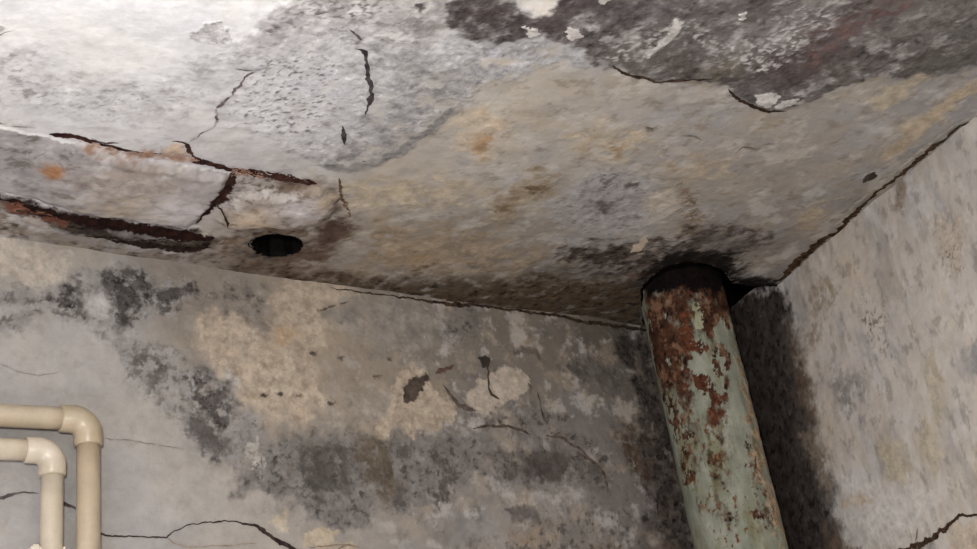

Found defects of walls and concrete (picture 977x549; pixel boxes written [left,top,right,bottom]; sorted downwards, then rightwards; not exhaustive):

crack [0,60,317,254]
rust [70,132,266,182]
crack [348,29,375,115]
peeling [0,0,977,217]
crack [778,112,977,282]
leakage [858,69,977,215]
peeling [178,276,383,442]
leakage [0,98,903,549]
peeling [360,353,548,442]
rust [642,262,789,549]
leakage [895,530,942,549]
crack [898,513,977,549]